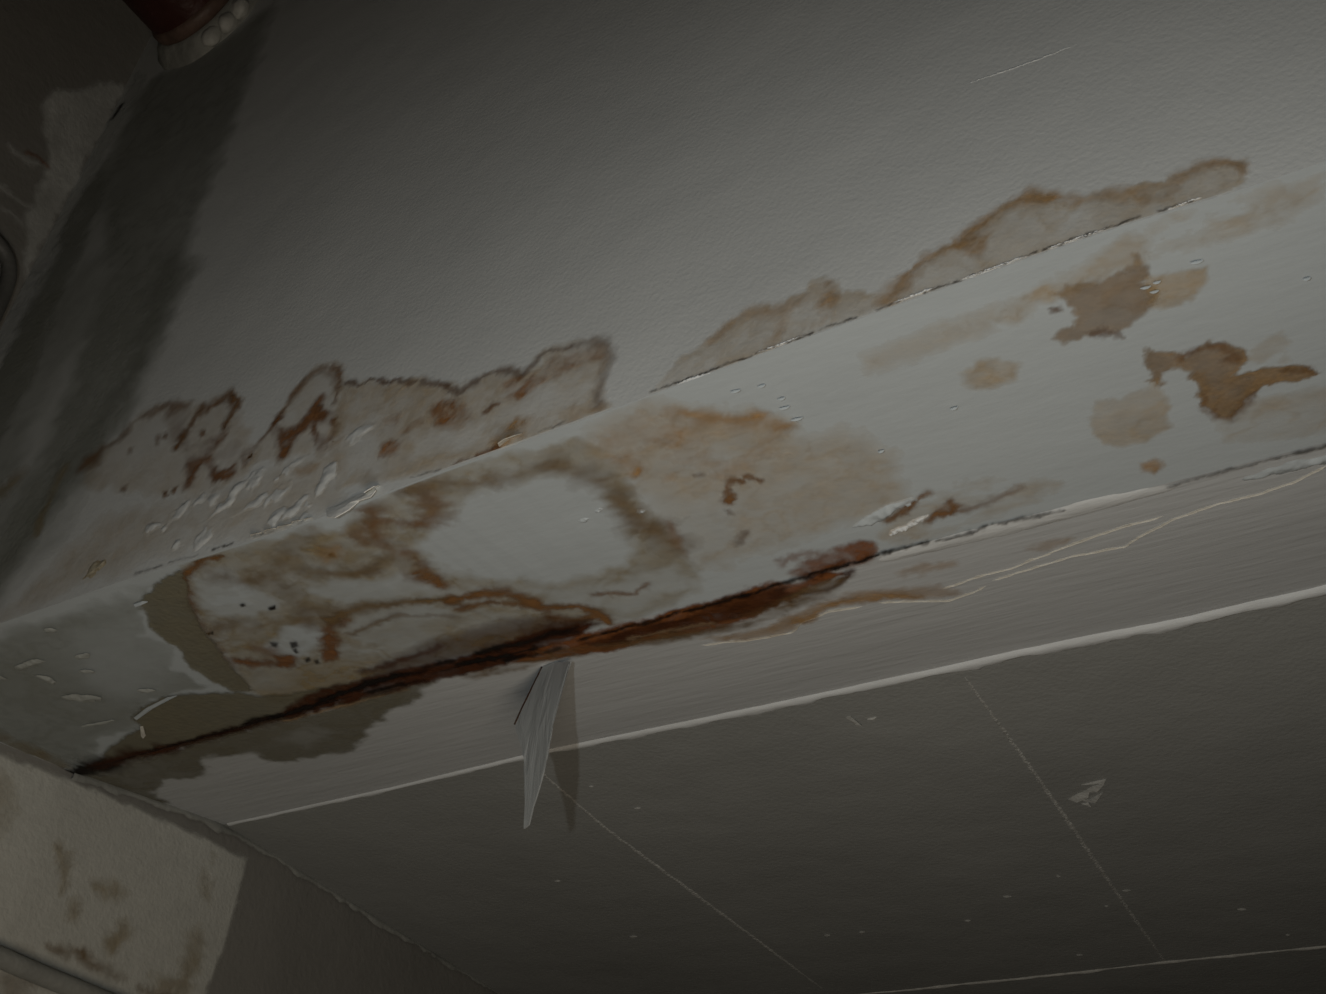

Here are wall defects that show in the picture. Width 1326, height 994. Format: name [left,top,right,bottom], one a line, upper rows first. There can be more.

water stain [0,61,246,577]
water stain [1053,268,1156,314]
water stain [268,395,336,459]
water stain [428,380,478,424]
crack [1242,445,1326,481]
water stain [182,555,224,615]
water stain [230,568,612,697]
crack [66,518,1023,775]